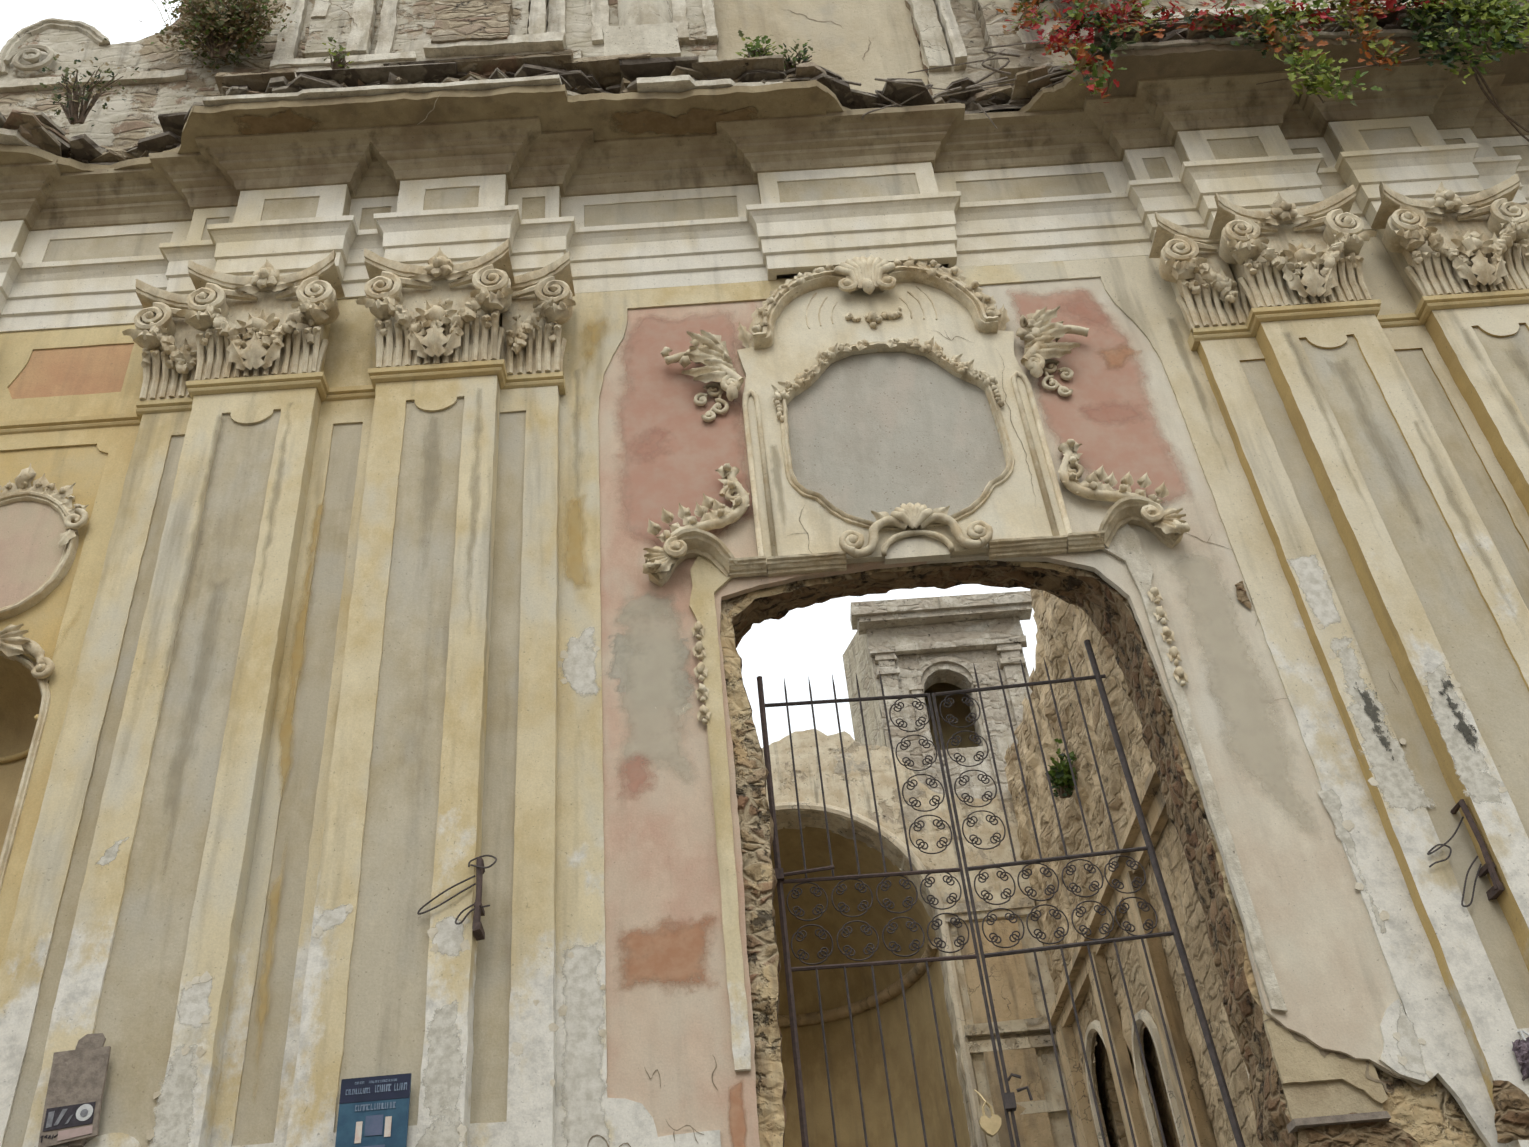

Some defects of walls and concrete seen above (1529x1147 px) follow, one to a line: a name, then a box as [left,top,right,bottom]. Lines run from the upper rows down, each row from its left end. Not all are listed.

water stain [280,505,322,778]
flaking render [558,627,640,695]
flaking render [1288,555,1435,811]
flaking render [1422,665,1507,803]
flaking render [548,943,610,1147]
flaking render [1393,1007,1433,1078]